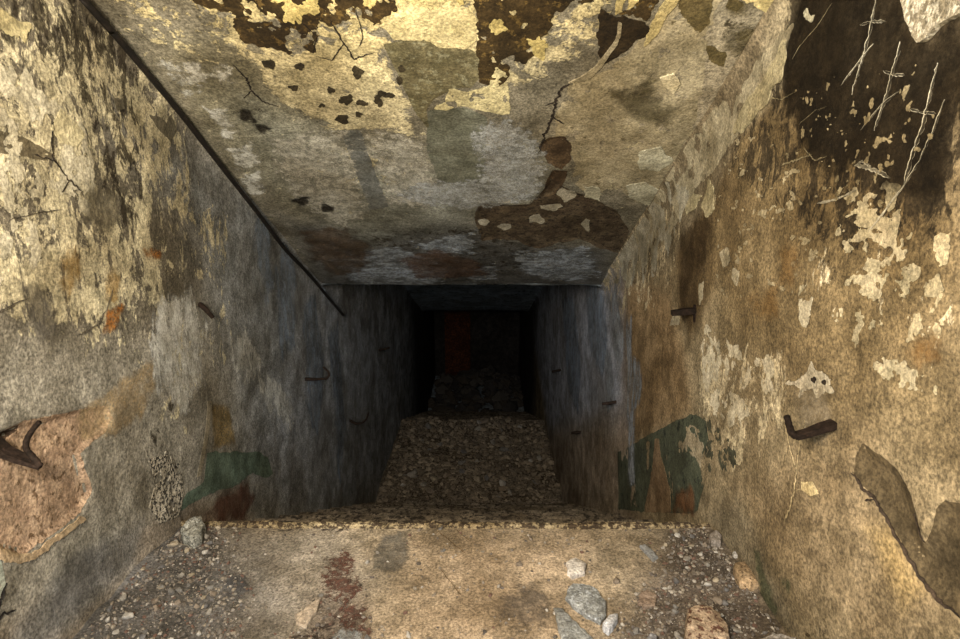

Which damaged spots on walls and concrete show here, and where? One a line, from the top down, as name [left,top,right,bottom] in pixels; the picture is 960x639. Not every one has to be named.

peeling [192,0,397,71]
peeling [473,0,659,86]
spalling [0,131,55,161]
peeling [318,65,406,124]
crack [538,83,571,153]
spalling [474,23,794,289]
peeling [894,232,951,343]
peeling [852,309,883,348]
peeling [873,357,938,395]
spalling [0,406,114,597]
spalling [854,443,960,616]
crack [0,583,16,620]